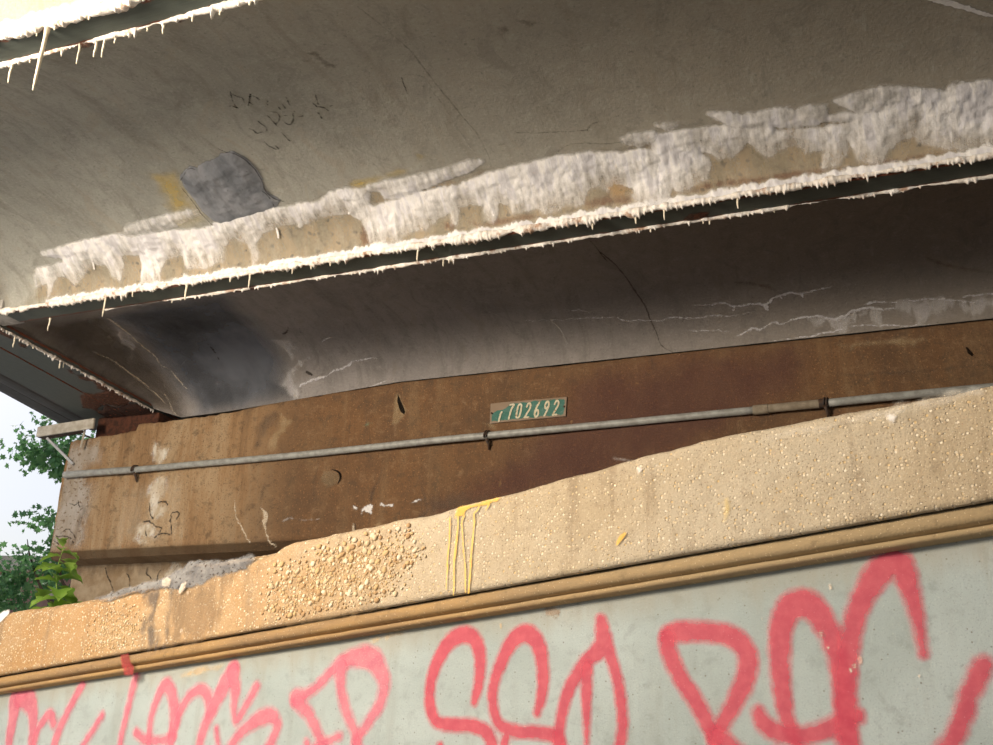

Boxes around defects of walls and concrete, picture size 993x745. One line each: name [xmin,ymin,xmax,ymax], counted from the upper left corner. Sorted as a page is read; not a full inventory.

efflorescence [0,0,262,91]
water stain [0,80,993,413]
rust [69,370,156,418]
spalling [81,556,254,655]
spalling [260,523,427,621]